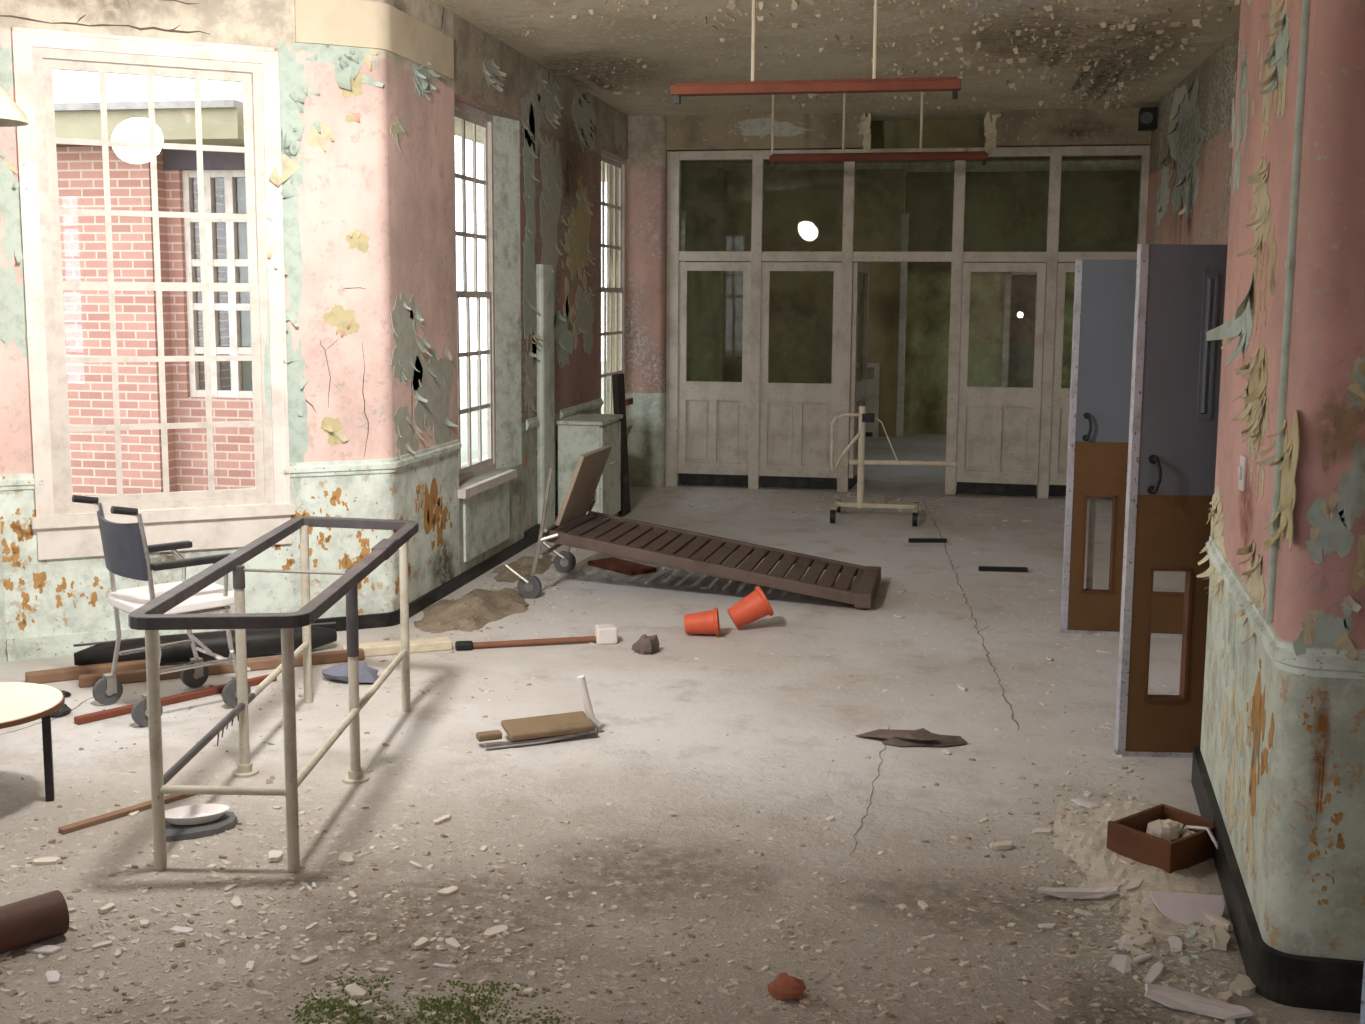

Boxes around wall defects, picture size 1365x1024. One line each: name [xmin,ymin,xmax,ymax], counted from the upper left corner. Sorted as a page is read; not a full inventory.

peeling [413,62,440,101]
peeling [263,39,383,591]
peeling [390,293,457,461]
peeling [521,58,671,419]
crack [923,500,1019,730]
crack [850,728,889,854]
rust [1314,708,1328,812]
peeling [1308,750,1345,905]